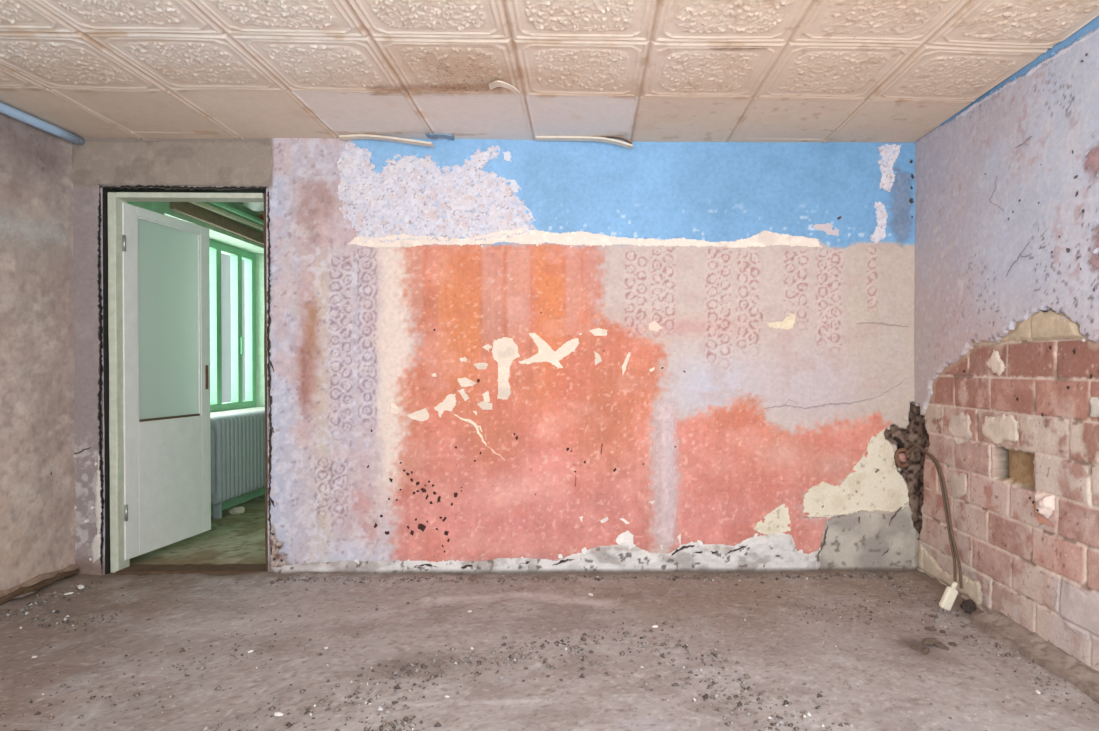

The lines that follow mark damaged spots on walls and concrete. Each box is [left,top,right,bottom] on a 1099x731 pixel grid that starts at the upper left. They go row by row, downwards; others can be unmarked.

peeling [337,143,840,248]
peeling [870,144,914,244]
flaking render [269,310,1099,671]